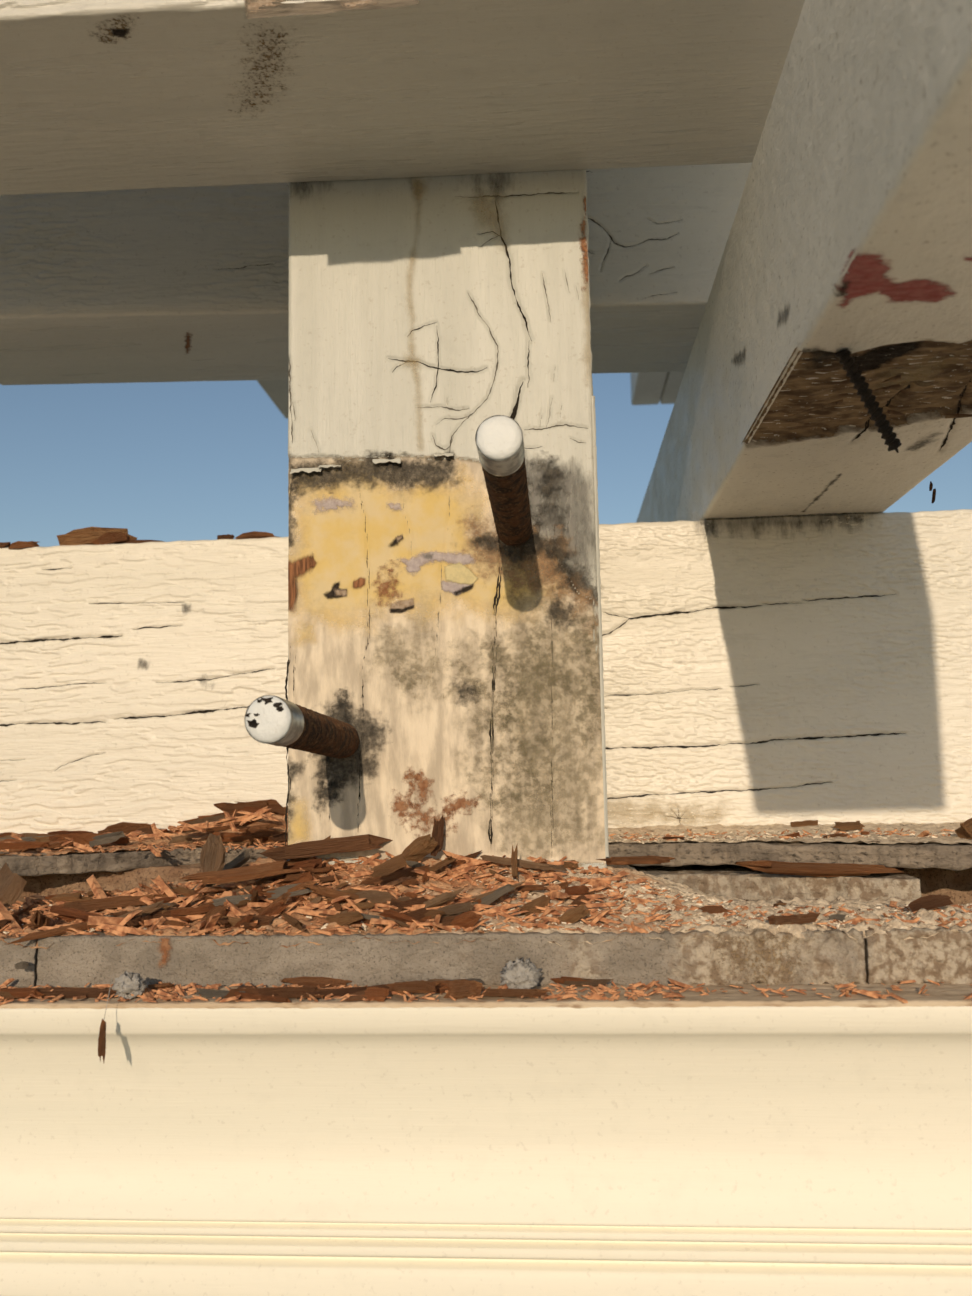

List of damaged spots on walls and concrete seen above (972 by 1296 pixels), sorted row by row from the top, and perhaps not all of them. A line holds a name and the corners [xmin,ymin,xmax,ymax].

peeling [837,251,956,306]
crack [388,200,683,462]
spalling [742,340,972,444]
crack [0,602,182,644]
peeling [245,396,609,864]
leakage [288,453,598,848]
crack [602,594,895,636]
crack [0,646,296,767]
crack [606,733,906,749]
crack [284,748,292,846]
corrosion [393,770,477,836]
crack [607,782,830,822]